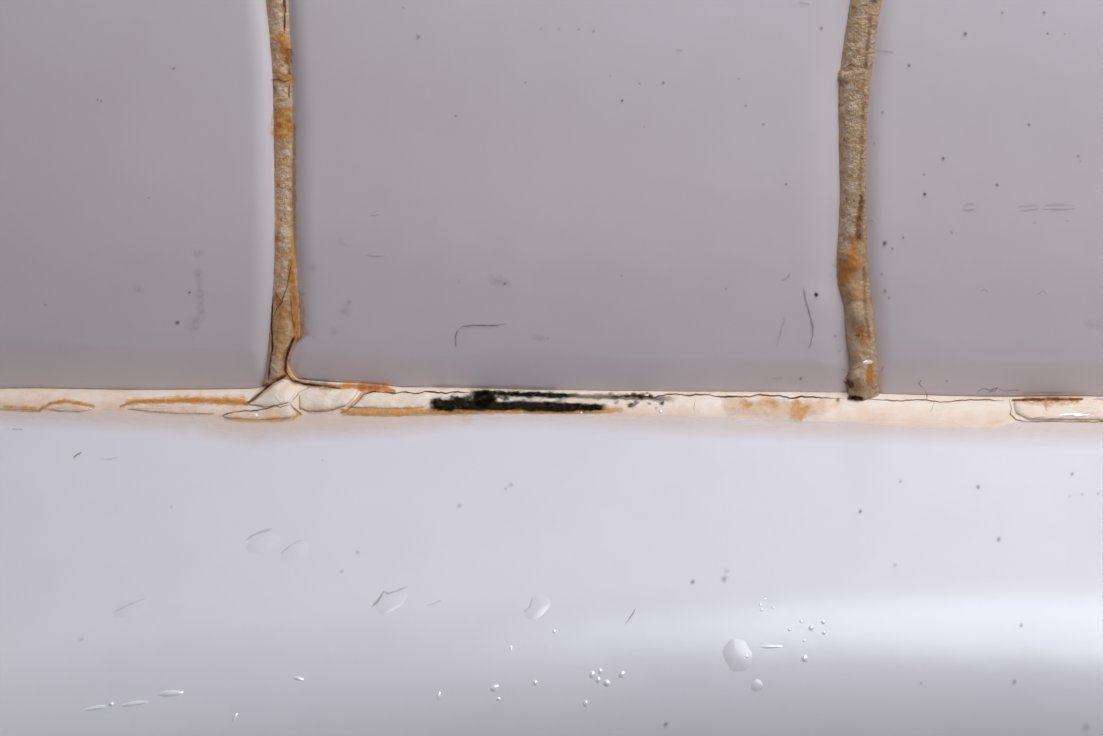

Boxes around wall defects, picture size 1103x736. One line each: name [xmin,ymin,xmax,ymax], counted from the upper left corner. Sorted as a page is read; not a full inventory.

rust [274,33,293,85]
rust [272,107,305,354]
rust [838,237,863,299]
crack [222,267,469,416]
rust [0,399,94,411]
rust [121,396,302,422]
water stain [431,390,663,412]
crack [611,381,1103,423]